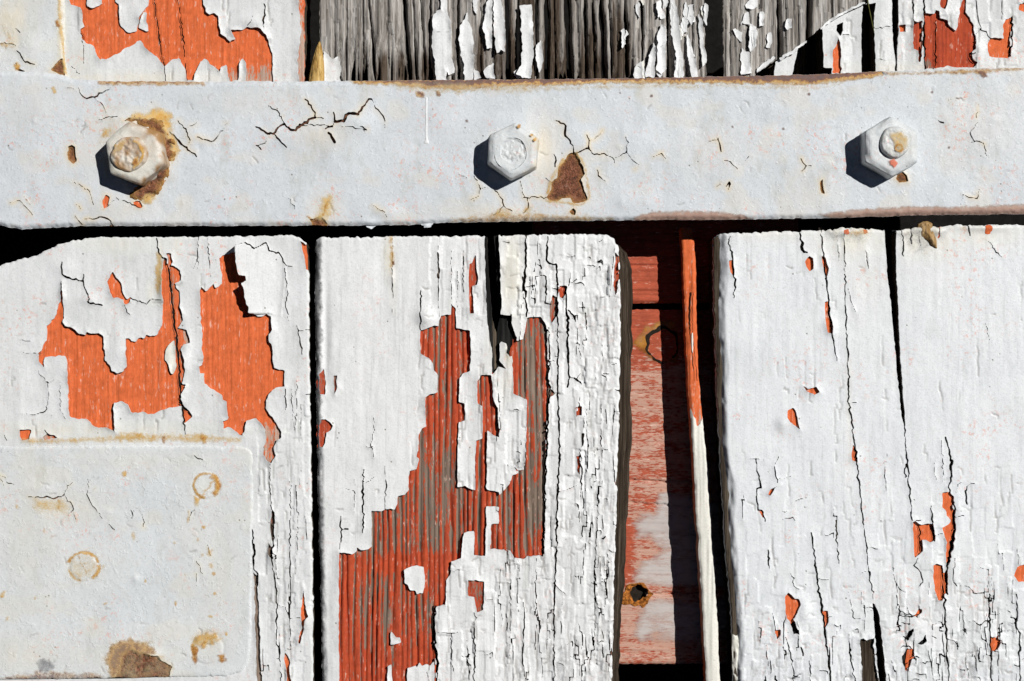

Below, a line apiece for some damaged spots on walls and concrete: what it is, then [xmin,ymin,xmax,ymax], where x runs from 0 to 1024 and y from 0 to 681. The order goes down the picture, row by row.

peeling [69,0,273,82]
peeling [432,0,506,80]
rust [115,141,144,168]
rust [125,109,179,203]
rust [453,153,590,222]
crack [728,237,736,298]
peeling [38,253,285,463]
peeling [339,286,565,681]
crack [419,234,603,681]
crack [799,227,1021,681]
crack [755,458,878,681]
rust [106,639,172,678]